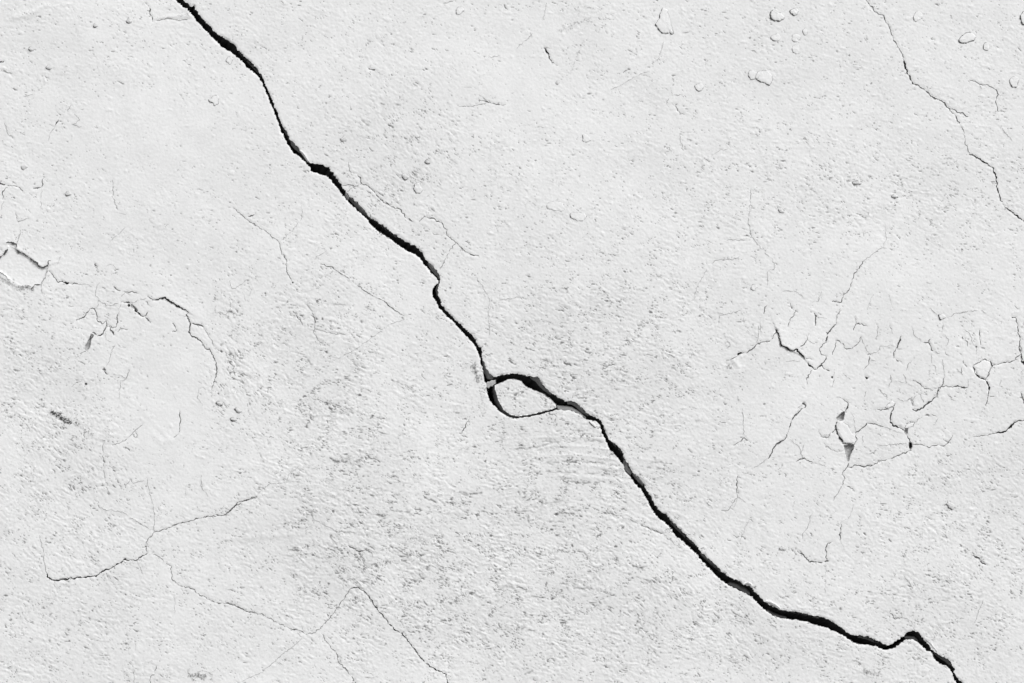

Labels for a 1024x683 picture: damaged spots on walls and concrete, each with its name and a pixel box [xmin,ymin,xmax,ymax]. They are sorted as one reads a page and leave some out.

crack [866,0,1024,221]
crack [51,258,252,436]
crack [149,0,962,683]
crack [694,190,1024,593]
crack [39,424,448,683]